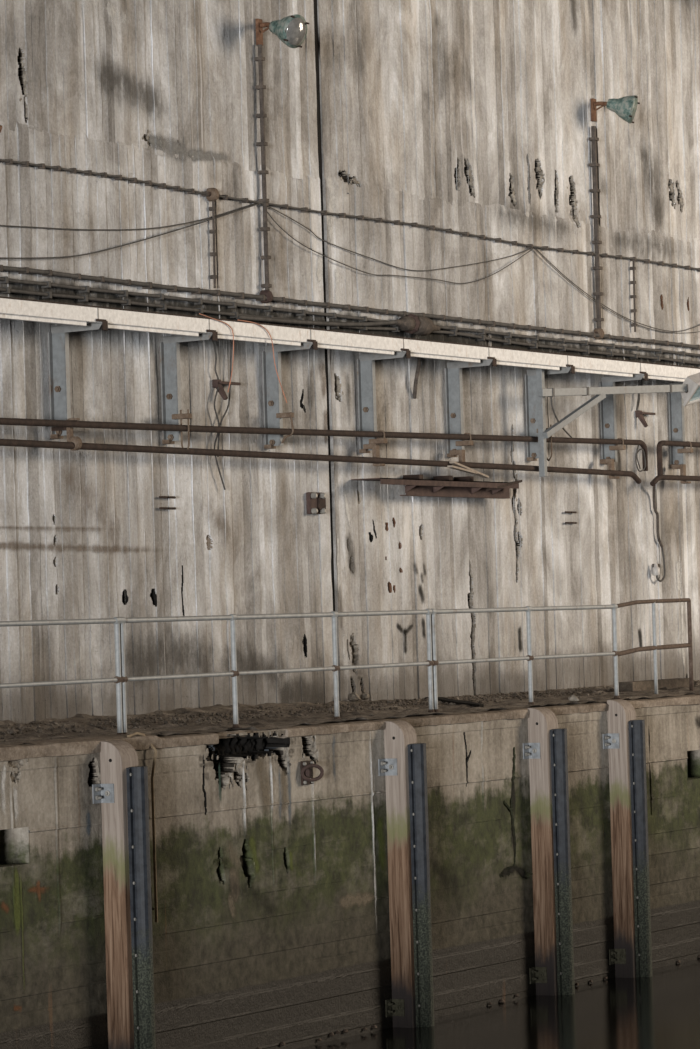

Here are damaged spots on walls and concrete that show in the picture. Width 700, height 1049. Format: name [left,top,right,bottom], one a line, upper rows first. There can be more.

spalling [17,47,28,123]
spalling [454,158,475,198]
spalling [508,153,581,228]
spalling [668,179,684,213]
spalling [203,731,319,791]
water stain [340,761,385,908]
crack [499,747,531,879]